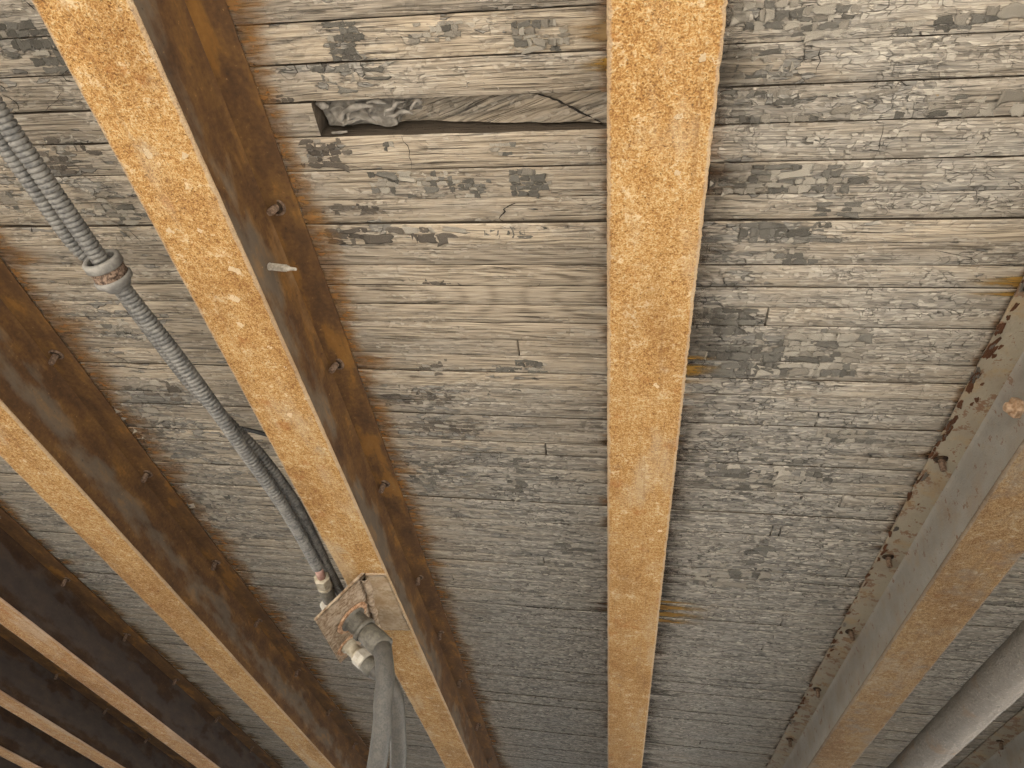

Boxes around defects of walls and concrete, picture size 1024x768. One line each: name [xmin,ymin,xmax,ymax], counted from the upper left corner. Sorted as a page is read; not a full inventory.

peeling [0,19,70,74]
peeling [714,0,1024,125]
crack [501,64,604,124]
peeling [298,138,353,173]
peeling [708,162,870,265]
peeling [696,307,874,378]
peeling [928,280,1024,460]
peeling [739,412,876,444]
peeling [694,458,841,498]
peeling [693,546,788,590]
peeling [855,526,899,599]